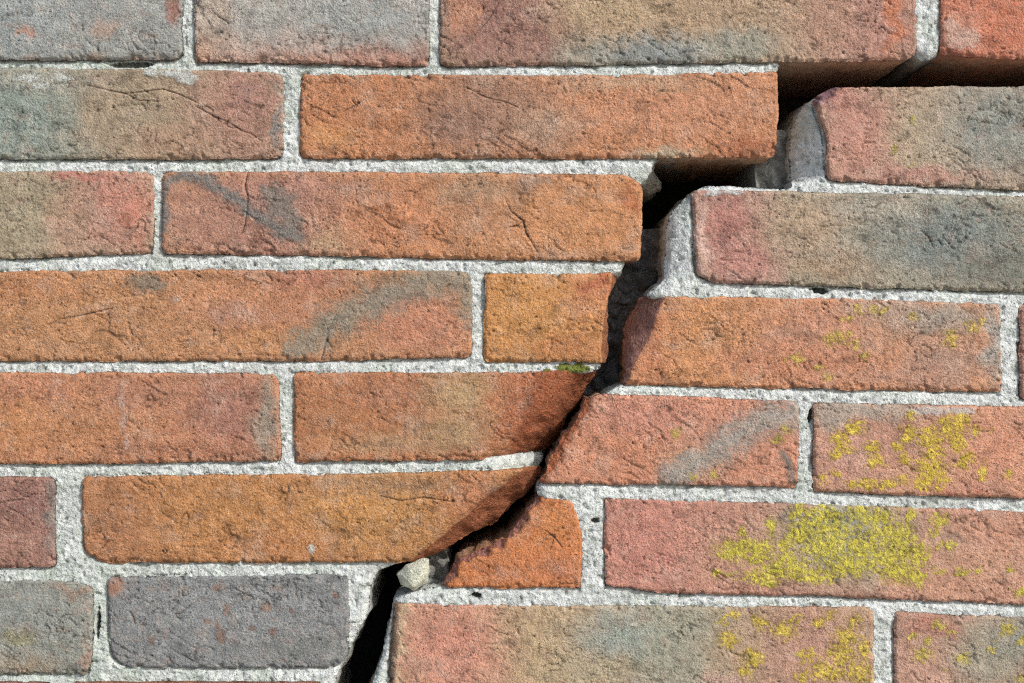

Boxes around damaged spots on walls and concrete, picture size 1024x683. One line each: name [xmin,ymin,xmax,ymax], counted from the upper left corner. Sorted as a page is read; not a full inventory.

crack [506,201,537,251]
crack [565,97,814,423]
crack [350,485,535,683]